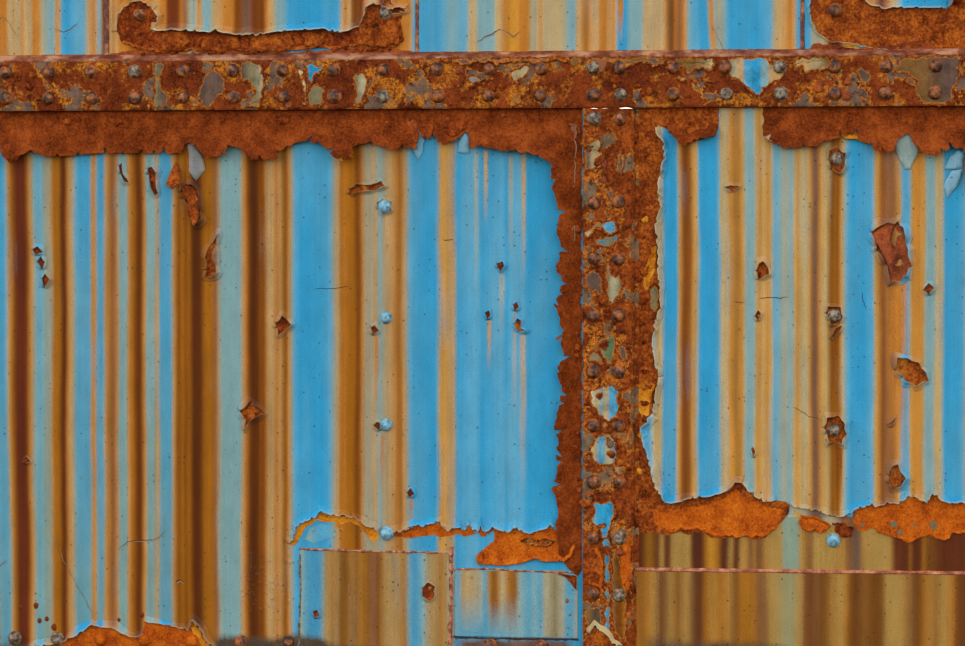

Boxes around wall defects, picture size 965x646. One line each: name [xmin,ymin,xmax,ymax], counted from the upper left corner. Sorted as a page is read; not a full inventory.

corrosion [6,150,35,646]
corrosion [50,154,75,641]
corrosion [91,149,160,633]
corrosion [171,144,221,645]
corrosion [241,146,291,641]
peeling [0,0,633,646]
corrosion [677,141,698,498]
peeling [419,0,965,198]
corrosion [636,532,770,646]
corrosion [720,107,773,500]
peeling [636,108,965,543]
corrosion [793,130,965,646]